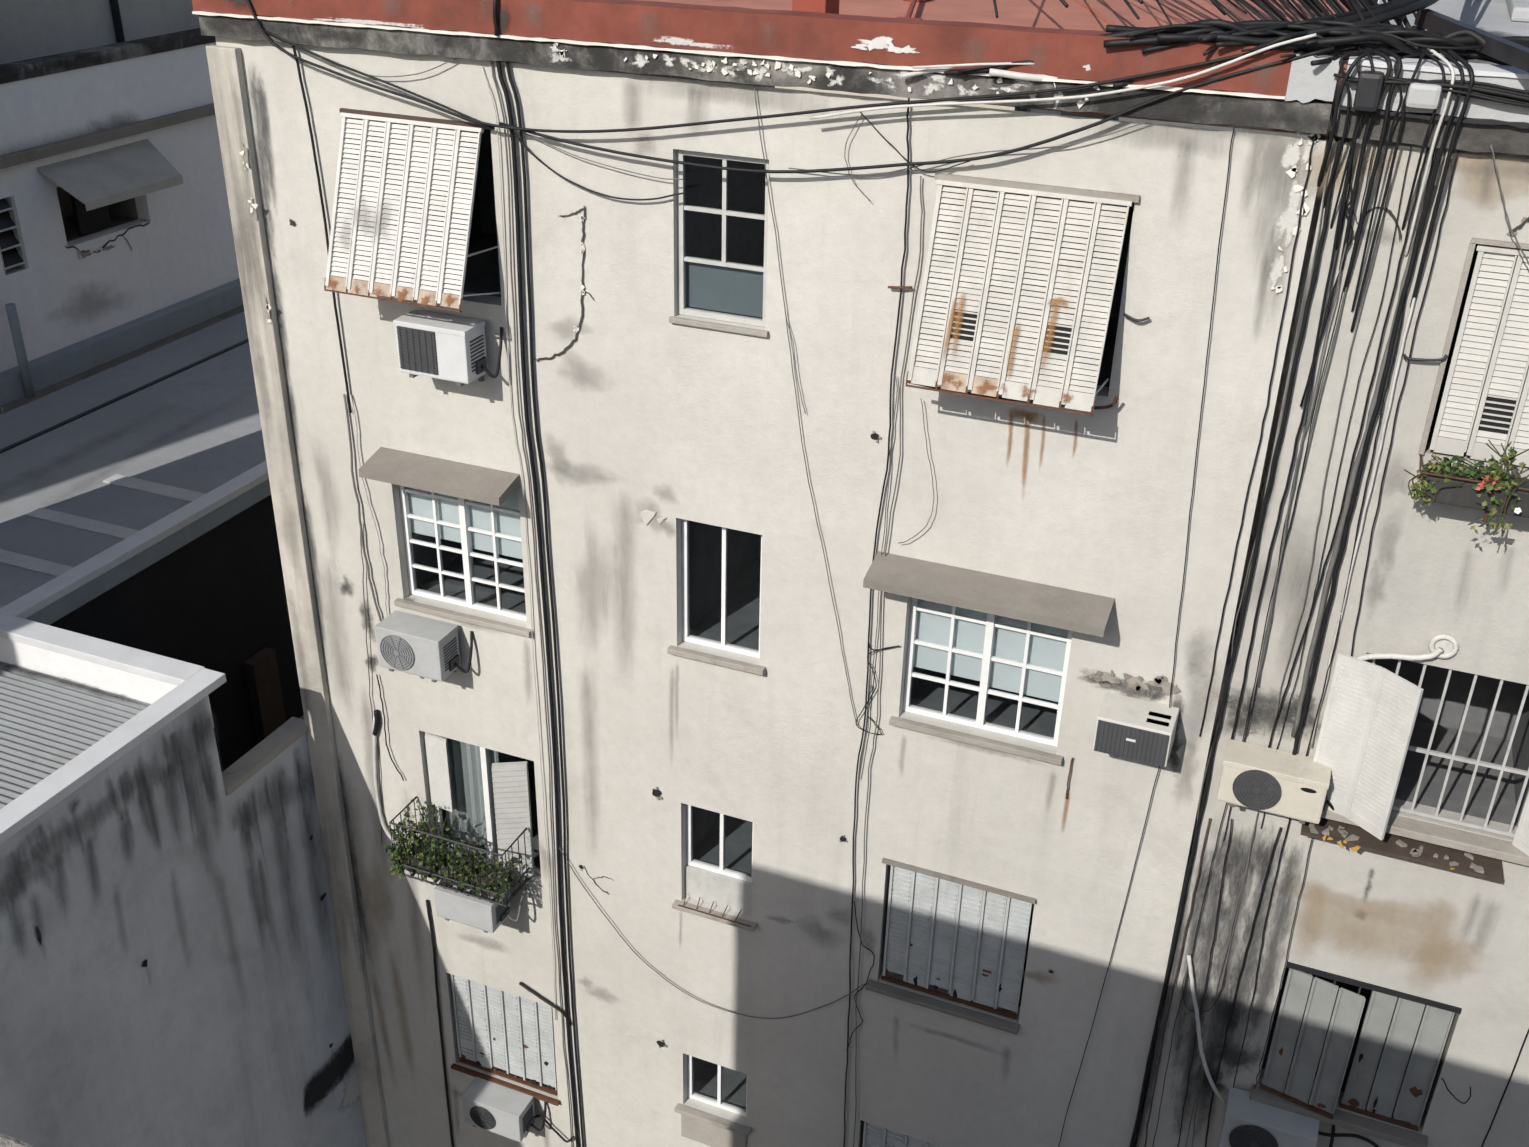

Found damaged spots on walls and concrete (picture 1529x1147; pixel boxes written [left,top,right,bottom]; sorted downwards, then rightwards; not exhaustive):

peeling [624,54,844,86]
peeling [869,70,1100,108]
peeling [1269,132,1321,294]
rust [324,277,462,313]
crack [536,206,594,362]
rust [1008,327,1018,370]
rust [1044,298,1065,354]
rust [906,371,1095,476]
leakage [1269,281,1307,495]
peeling [1092,670,1181,696]
leakage [1147,840,1296,1109]
leakage [304,1035,355,1112]